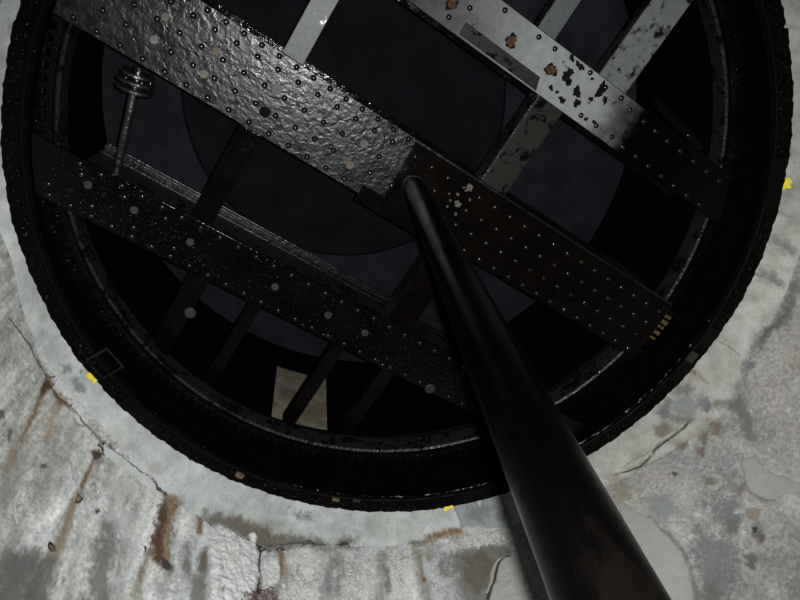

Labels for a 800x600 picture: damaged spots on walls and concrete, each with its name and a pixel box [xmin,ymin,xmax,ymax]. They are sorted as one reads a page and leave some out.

corrosion [11,377,76,455]
crack [8,317,172,497]
corrosion [80,444,104,487]
crack [616,422,689,475]
corrosion [150,494,179,571]
crack [253,540,348,600]